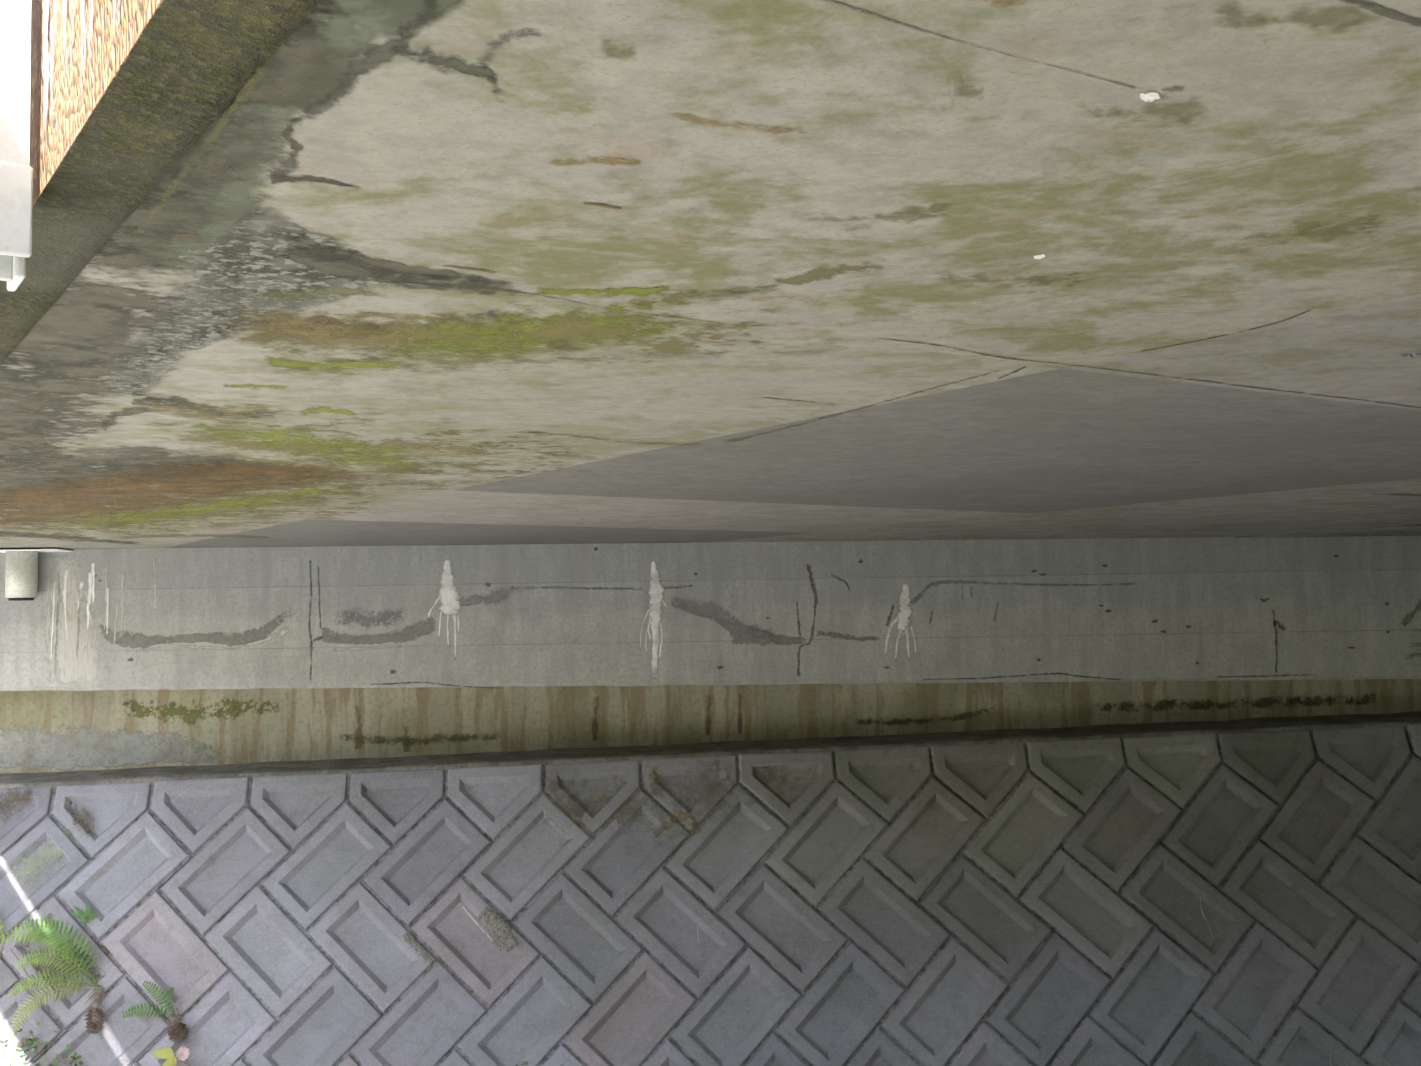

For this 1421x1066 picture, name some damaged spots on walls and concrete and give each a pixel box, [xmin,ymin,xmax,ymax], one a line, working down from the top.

damp [490,29,538,46]
crack [1344,0,1421,27]
damp [0,0,509,544]
damp [44,559,288,684]
crack [308,560,322,680]
damp [323,560,1108,673]
crack [796,564,849,676]
damp [0,726,214,771]
damp [859,708,992,726]
damp [1101,695,1375,711]